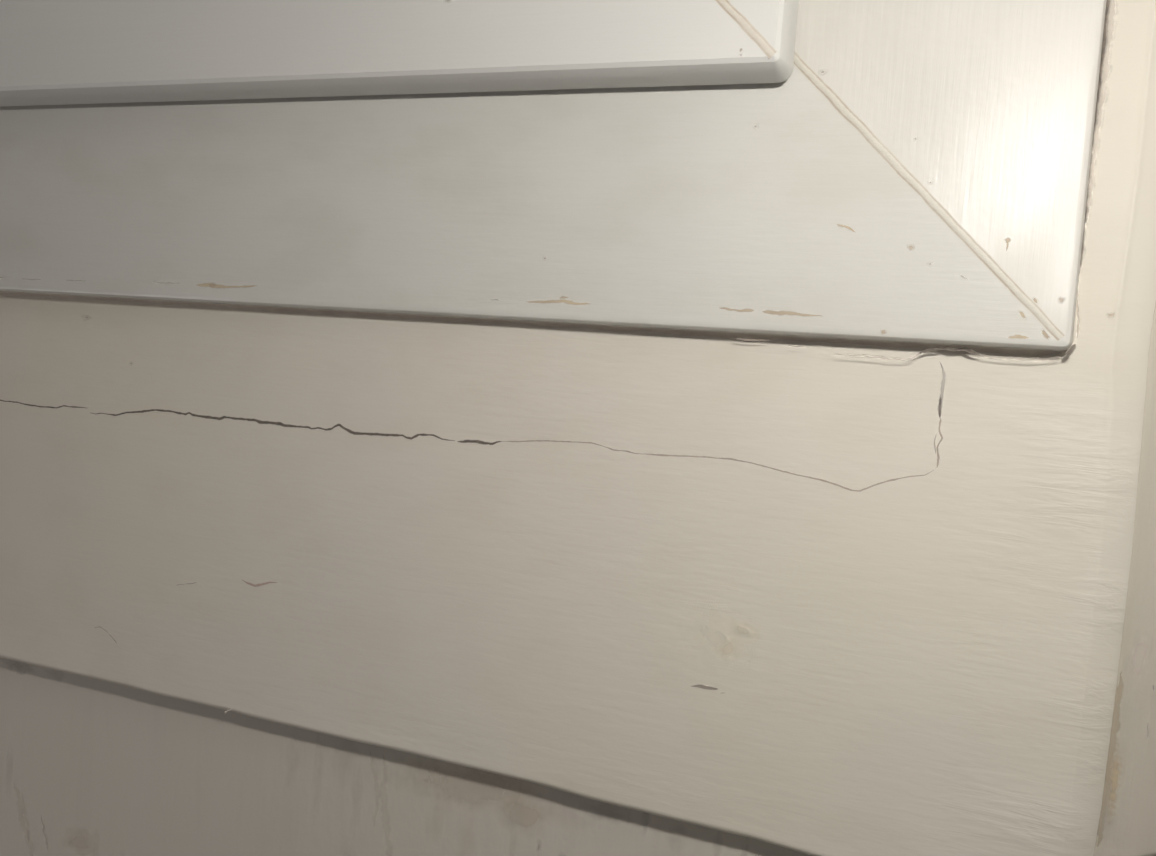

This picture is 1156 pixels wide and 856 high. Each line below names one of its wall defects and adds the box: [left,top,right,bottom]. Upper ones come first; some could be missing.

crack [0,363,945,491]